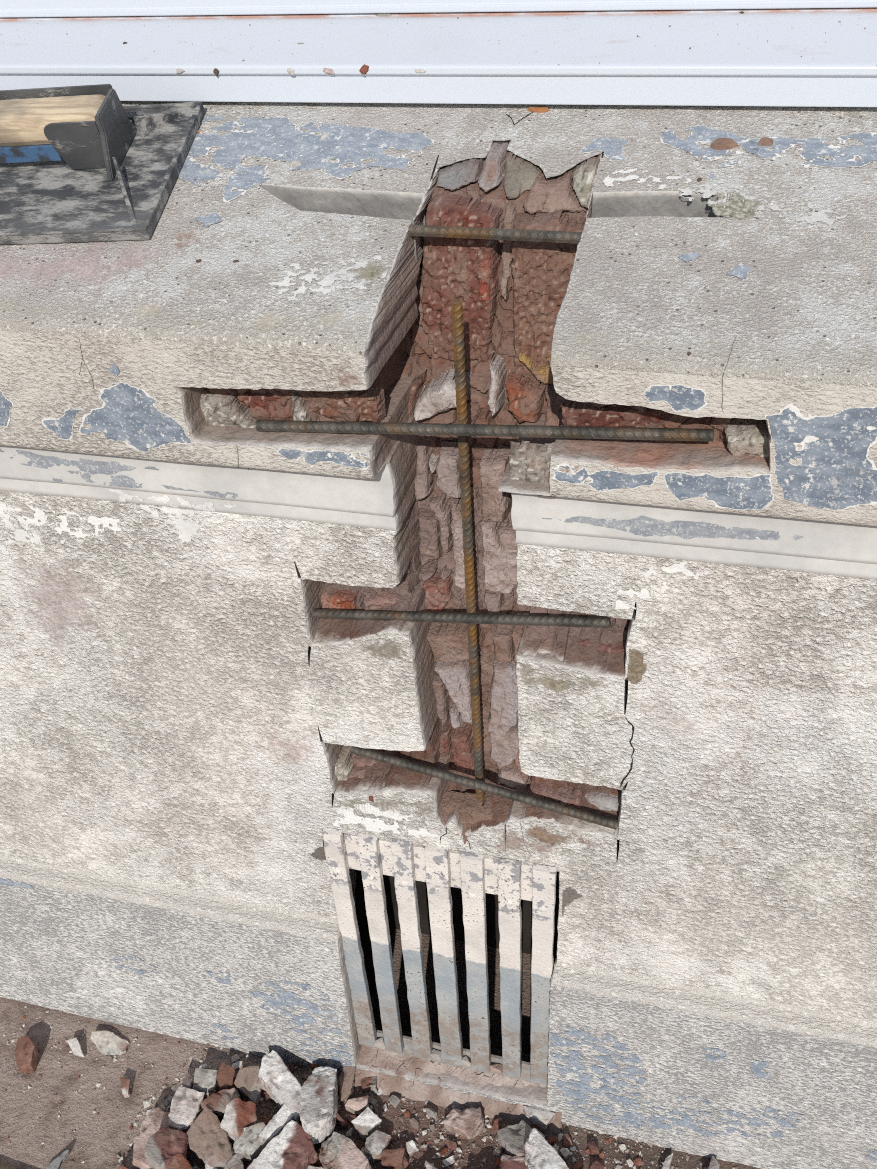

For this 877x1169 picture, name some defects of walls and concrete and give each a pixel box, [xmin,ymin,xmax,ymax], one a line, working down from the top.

peeling [0,390,14,427]
peeling [0,450,237,555]
spalling [41,110,877,844]
crack [620,717,635,787]
spalling [355,870,376,997]
spalling [383,875,401,939]
spalling [415,880,431,935]
spalling [450,887,465,941]
spalling [485,893,500,949]
spalling [521,899,532,954]
spalling [553,871,582,959]